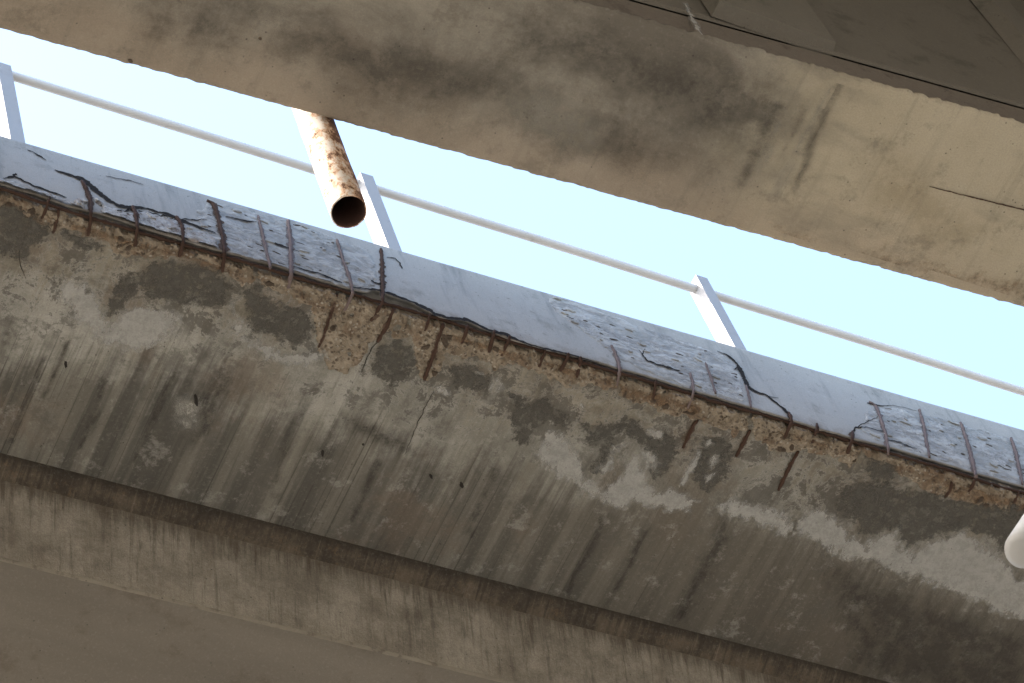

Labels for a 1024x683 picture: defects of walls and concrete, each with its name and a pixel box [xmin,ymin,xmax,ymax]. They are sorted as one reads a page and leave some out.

crack [5,150,256,234]
water stain [371,339,420,389]
rust [0,180,1024,504]
peeling [0,191,1024,512]
water stain [435,363,734,513]
crack [639,349,680,371]
crack [718,351,789,417]
crack [853,402,917,449]
water stain [718,455,1024,620]
water stain [843,585,1019,683]